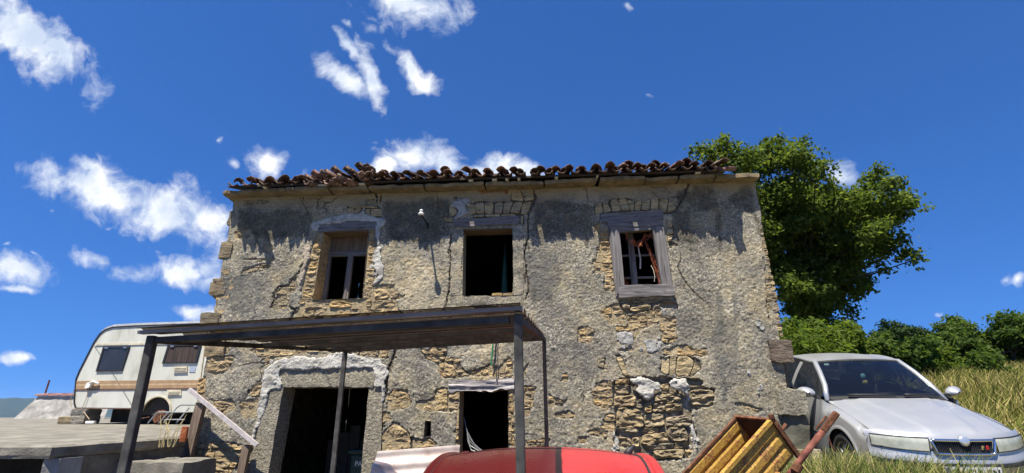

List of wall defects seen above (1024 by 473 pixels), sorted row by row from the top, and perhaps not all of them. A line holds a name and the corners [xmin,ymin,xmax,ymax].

crack [271,264,303,318]
spalling [273,183,405,317]
crack [445,229,454,307]
crack [524,193,536,299]
spalling [578,198,714,460]
peeling [196,345,545,473]
spalling [548,394,575,418]